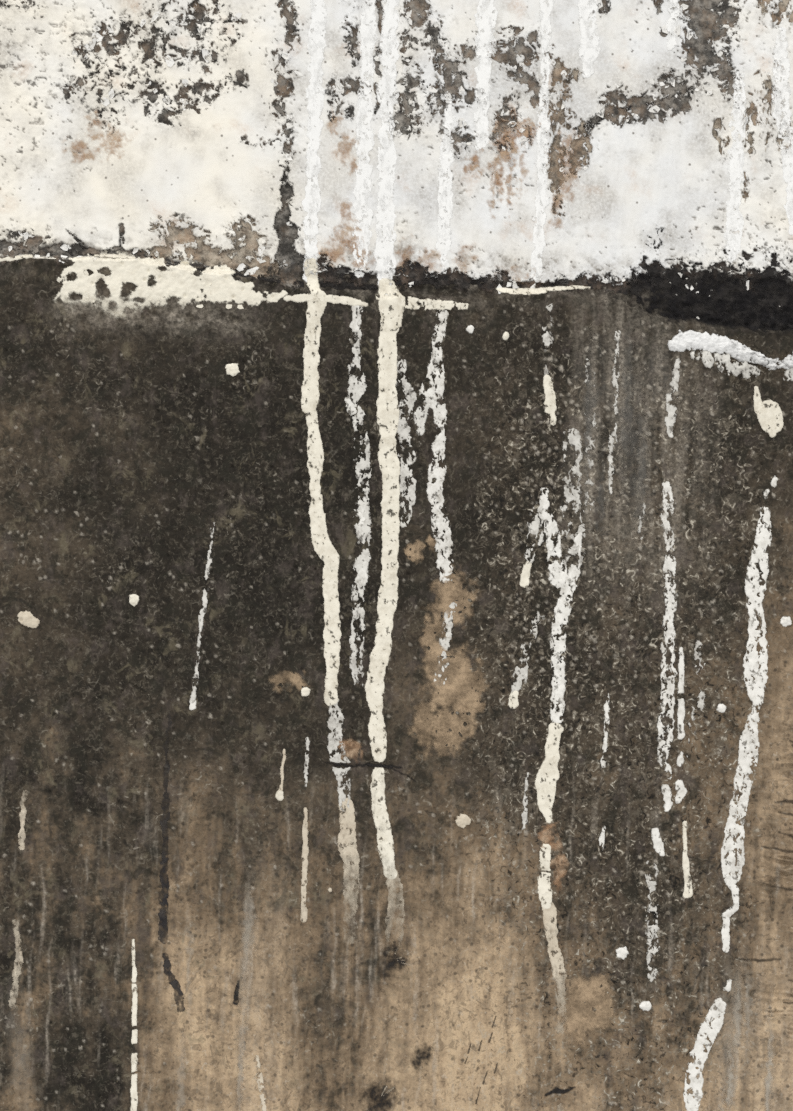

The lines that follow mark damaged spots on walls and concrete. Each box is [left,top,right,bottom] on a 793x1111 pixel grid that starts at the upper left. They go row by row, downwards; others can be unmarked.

peeling [0,0,373,317]
peeling [325,0,384,122]
peeling [390,0,793,216]
flaking render [392,228,793,297]
leakage [0,256,793,1111]